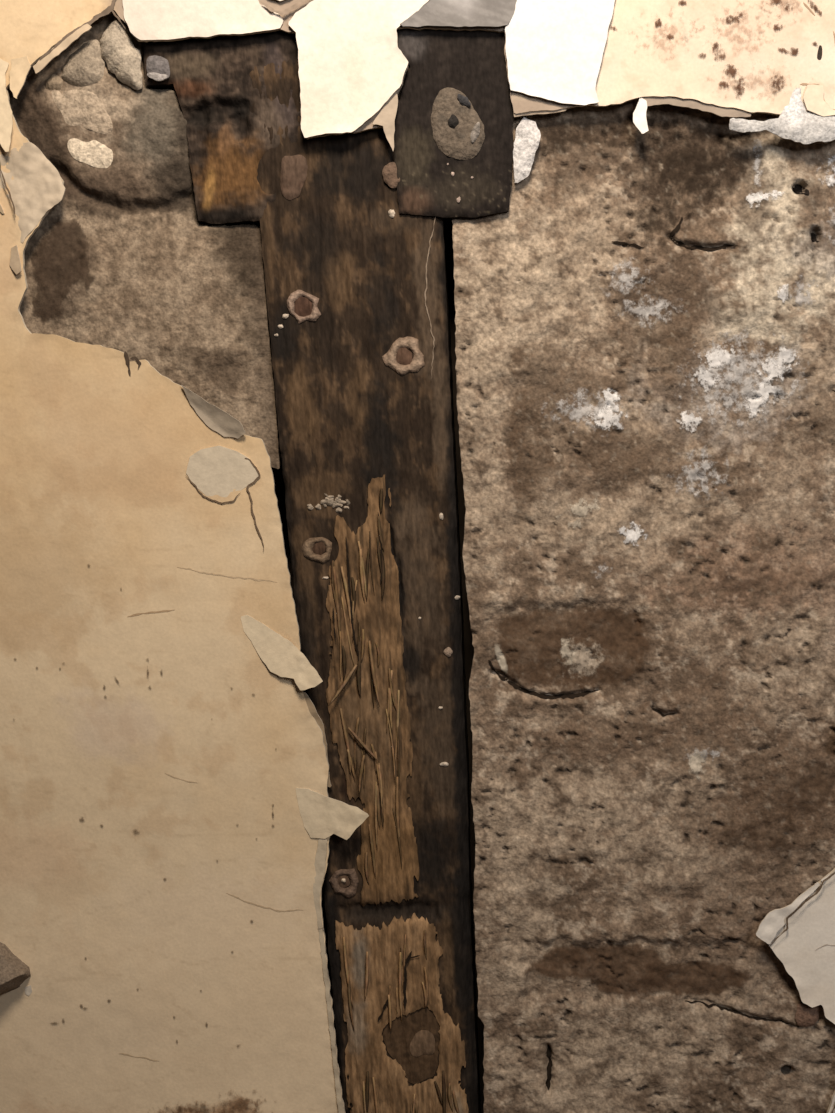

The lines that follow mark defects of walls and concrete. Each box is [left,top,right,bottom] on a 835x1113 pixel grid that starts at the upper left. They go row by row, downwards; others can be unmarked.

crack [612,240,644,248]
crack [669,217,734,251]
flaking render [7,10,282,552]
water stain [607,262,670,325]
efflorescence [677,330,800,432]
efflorescence [546,388,628,430]
water stain [619,521,647,546]
flaking render [452,98,835,1113]
water stain [495,606,649,687]
crack [488,660,598,699]
water stain [529,944,749,999]
crack [687,1000,796,1026]